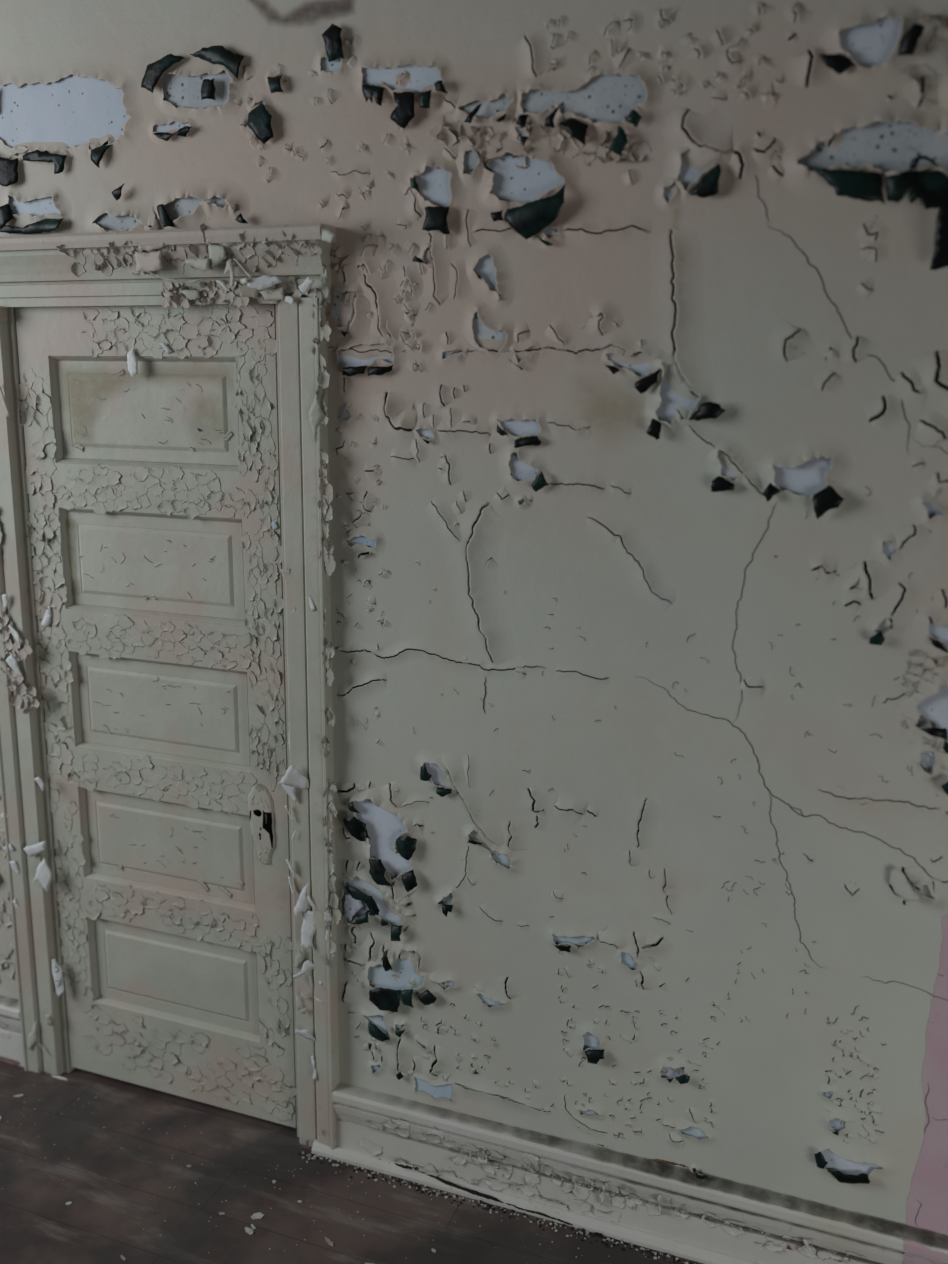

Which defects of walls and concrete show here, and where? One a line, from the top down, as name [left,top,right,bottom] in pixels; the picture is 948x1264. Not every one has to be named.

crack [513,29,553,79]
crack [317,135,371,221]
peeling [780,0,948,270]
crack [662,107,948,499]
peeling [704,436,852,520]
crack [328,168,948,1006]
peeling [831,529,914,607]
peeling [852,596,948,834]
crack [366,1024,607,1141]
peeling [359,1117,870,1264]
crack [662,1108,705,1151]
peeling [806,1004,897,1187]